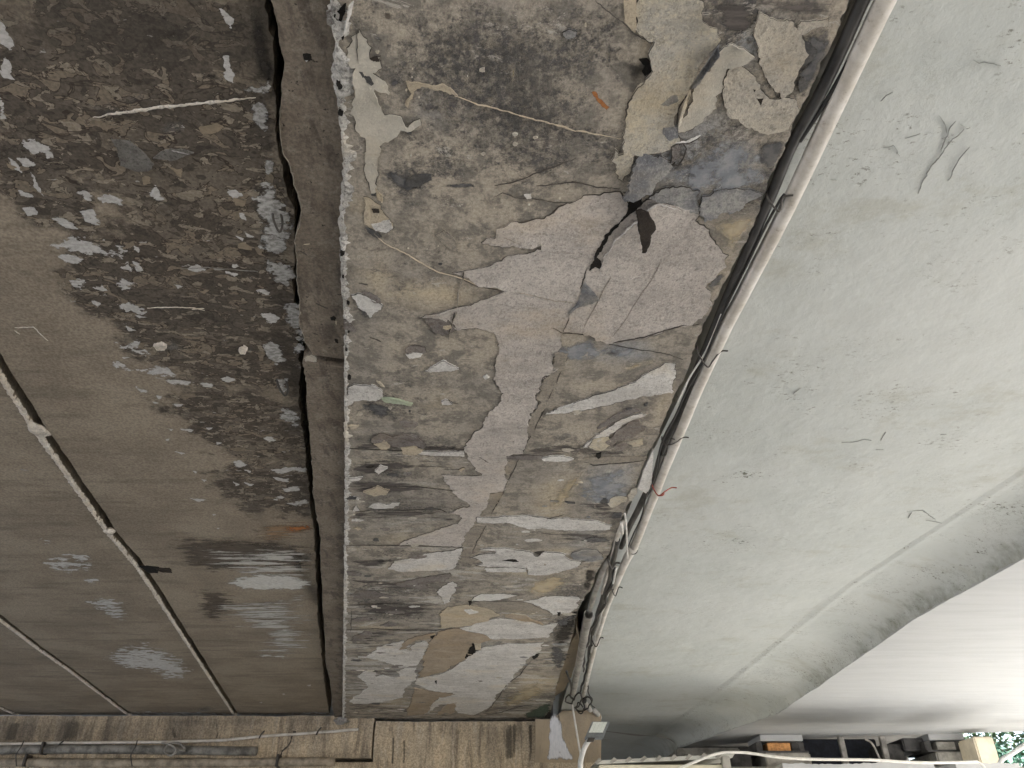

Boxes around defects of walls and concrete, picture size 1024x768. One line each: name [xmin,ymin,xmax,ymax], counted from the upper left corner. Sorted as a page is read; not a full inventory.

water stain [246,22,273,132]
water stain [111,138,194,172]
water stain [252,160,296,286]
crack [493,158,620,203]
water stain [263,303,304,365]
peeling [326,0,829,718]
water stain [279,408,300,428]
water stain [178,539,316,657]